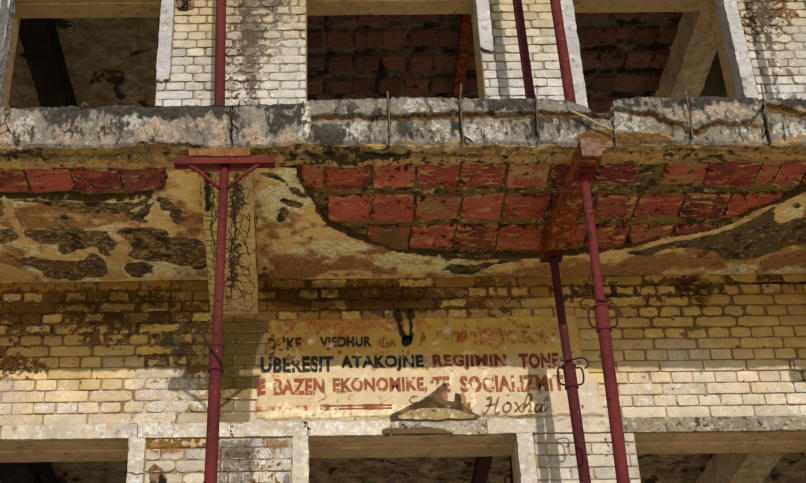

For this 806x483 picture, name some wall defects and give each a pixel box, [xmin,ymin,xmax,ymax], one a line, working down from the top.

damp [39,107,77,137]
damp [106,104,205,122]
damp [272,106,285,129]
crack [609,103,617,146]
crack [761,98,771,146]
spalling [0,167,207,281]
spalling [261,163,570,275]
spalling [563,160,806,260]
peeling [3,293,43,303]
peeling [26,292,168,333]
peeling [192,312,212,322]
peeling [130,323,192,365]